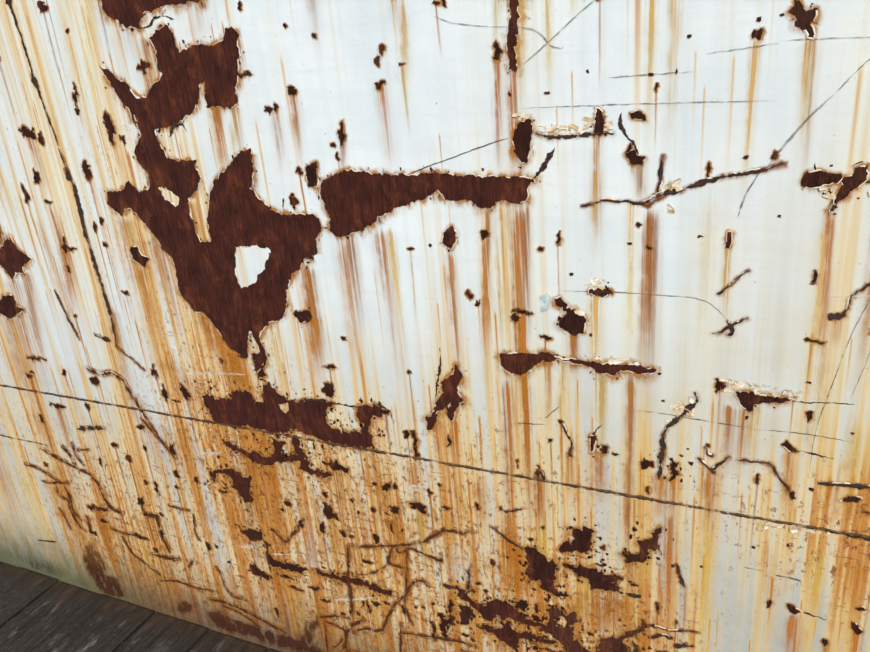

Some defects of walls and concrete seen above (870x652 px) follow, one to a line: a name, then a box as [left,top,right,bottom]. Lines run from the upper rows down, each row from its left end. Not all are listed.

corrosion [492,40,512,133]
peeling [0,226,36,325]
peeling [99,0,662,599]
corrosion [464,229,491,325]
corrosion [150,363,194,444]
corrosion [321,364,337,398]
peeling [719,378,855,440]
corrosion [83,503,124,597]
corrosion [110,442,165,578]
corrosion [319,430,453,651]
peeling [433,517,675,652]
corrosion [531,548,698,652]